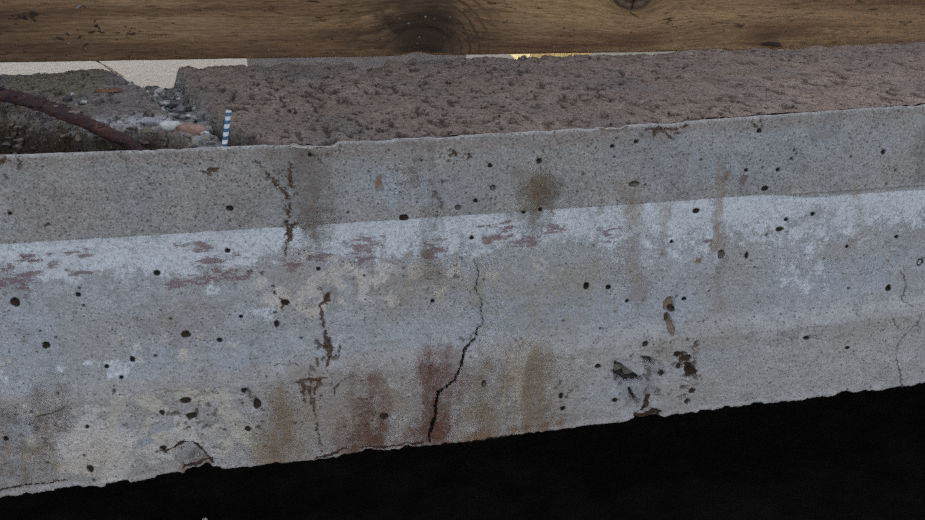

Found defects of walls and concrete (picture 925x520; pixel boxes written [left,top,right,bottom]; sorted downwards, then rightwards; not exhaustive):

crack [254,160,295,197]
crack [285,222,299,257]
crack [274,290,354,452]
crack [428,259,484,442]
spalling [612,341,663,417]
spalling [674,352,697,377]